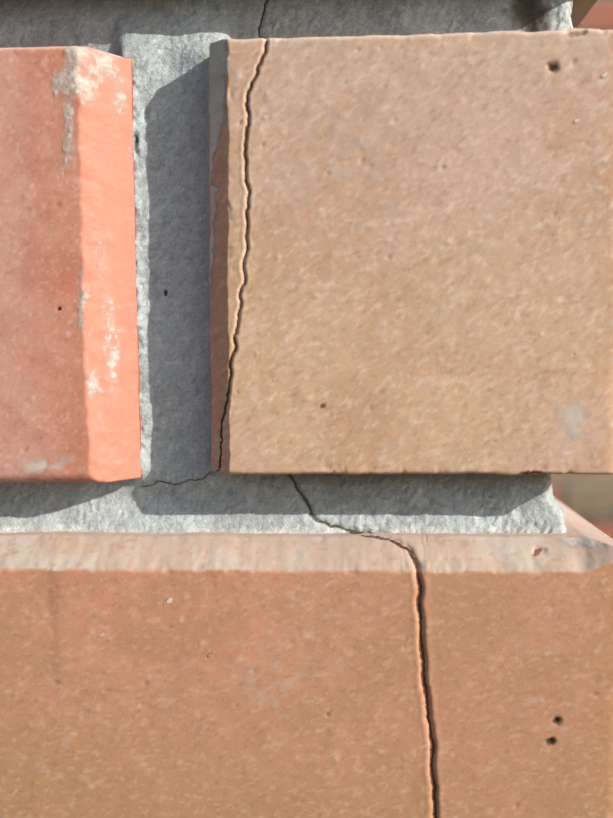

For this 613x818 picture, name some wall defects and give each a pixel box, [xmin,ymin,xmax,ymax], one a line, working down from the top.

peeling [87,372,102,396]
peeling [104,300,120,379]
crack [142,0,269,488]
crack [287,474,437,818]